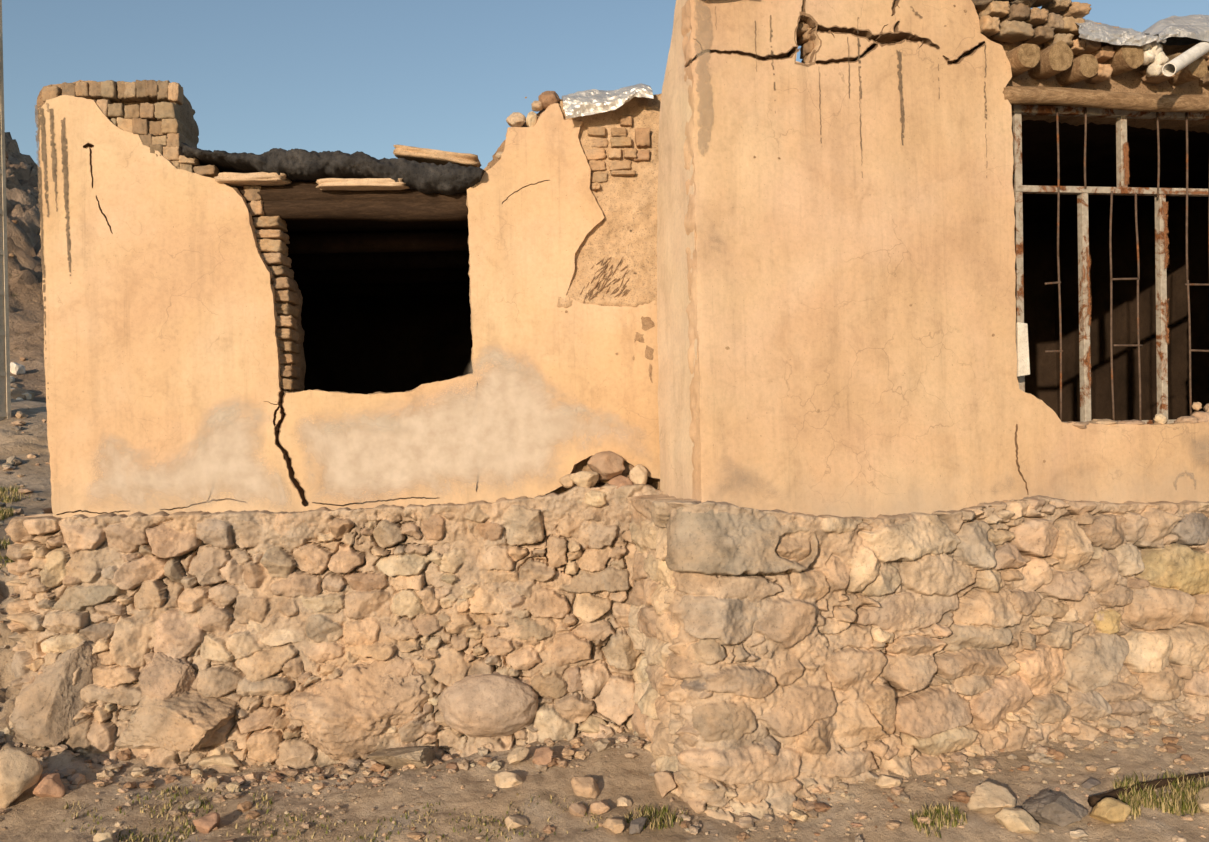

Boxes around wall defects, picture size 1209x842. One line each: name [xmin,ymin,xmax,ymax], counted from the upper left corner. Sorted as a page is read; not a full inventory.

crack [686,0,986,67]
leakage [847,37,862,99]
leakage [897,51,905,145]
leakage [35,105,71,344]
crack [83,142,113,234]
flaking render [557,93,662,383]
rust [1162,191,1208,269]
flaking render [243,185,301,391]
crack [56,508,130,516]
crack [160,491,246,511]
crack [264,390,439,507]
crack [1014,424,1028,494]